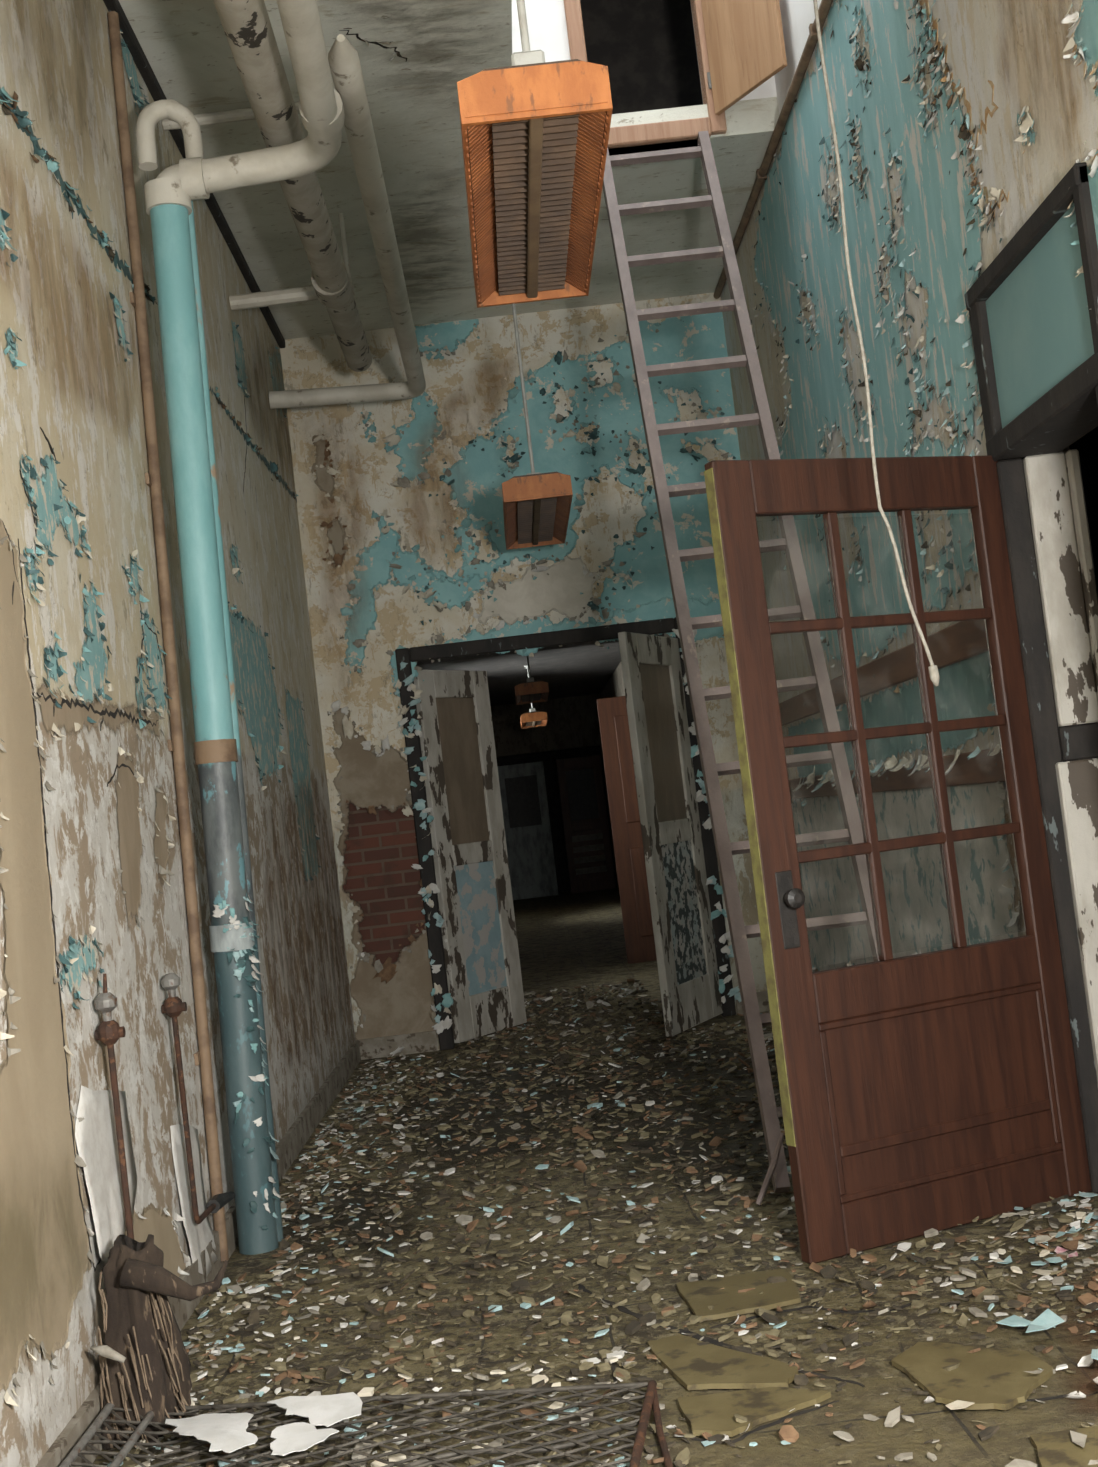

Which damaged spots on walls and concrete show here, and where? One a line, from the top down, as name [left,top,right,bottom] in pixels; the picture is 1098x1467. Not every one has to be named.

peeling [0,86,158,362]
peeling [750,0,1009,459]
flaking render [0,448,218,1407]
peeling [212,895,313,1172]
peeling [228,294,755,1056]
peeling [771,509,982,667]
peeling [785,651,1020,972]
crack [577,1284,921,1443]
crack [923,1395,943,1405]
peeling [994,1309,1064,1333]
peeling [993,1192,1098,1278]
crack [1026,1391,1098,1403]